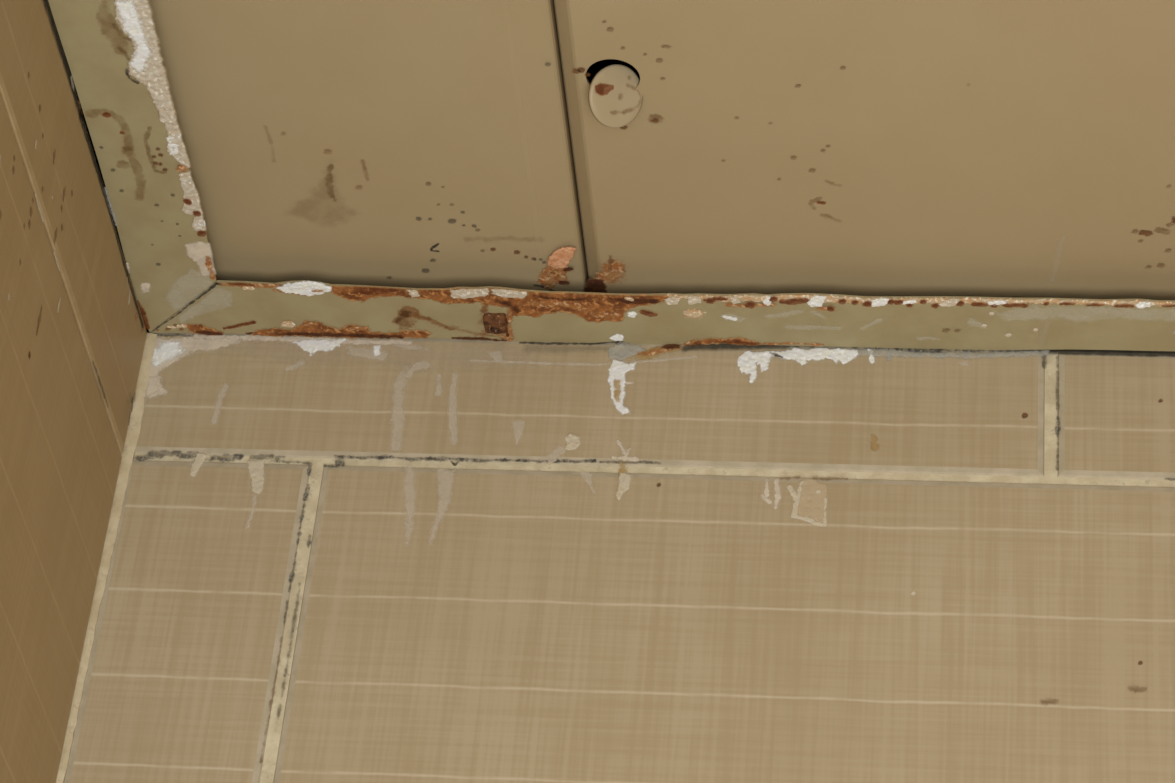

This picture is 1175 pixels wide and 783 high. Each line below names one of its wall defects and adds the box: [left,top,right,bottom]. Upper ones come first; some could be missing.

rust [152,148,187,172]
rust [171,194,207,237]
rust [136,256,1175,341]
rust [629,337,824,359]